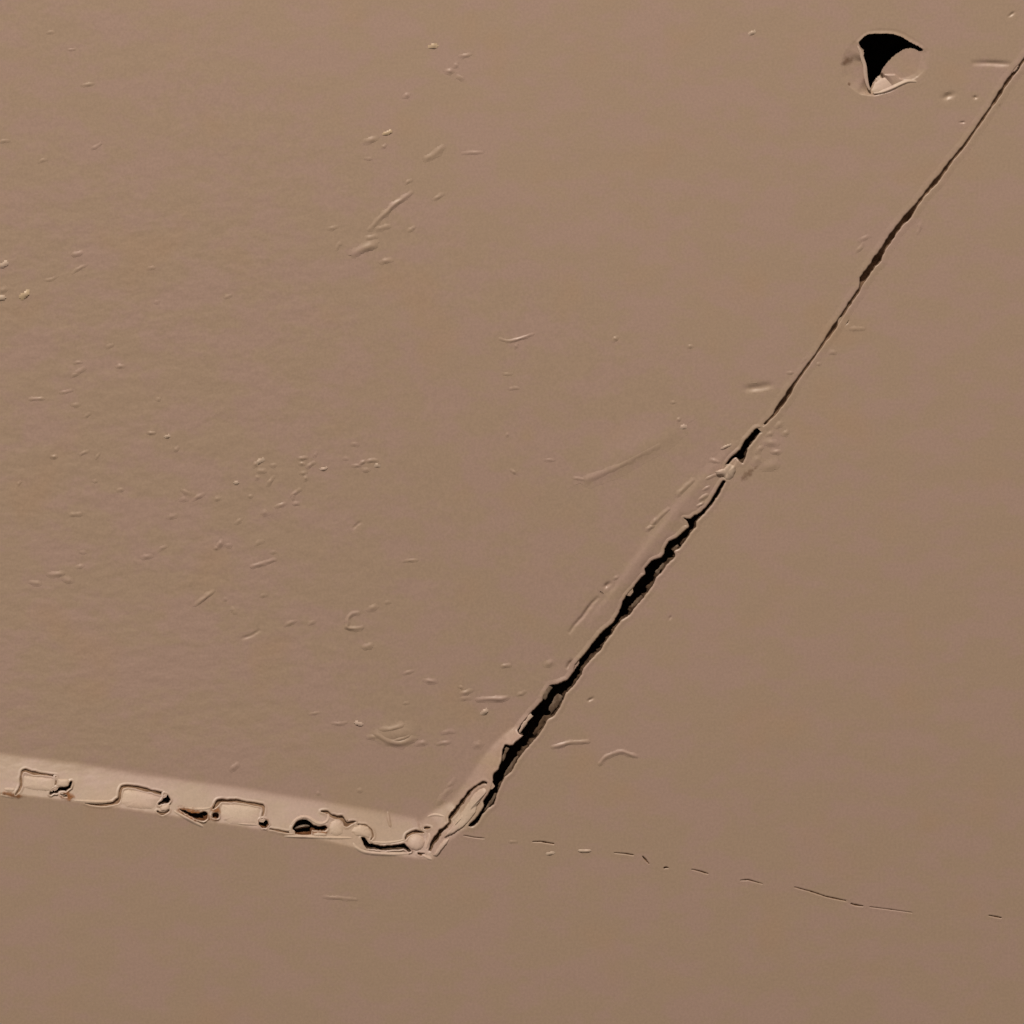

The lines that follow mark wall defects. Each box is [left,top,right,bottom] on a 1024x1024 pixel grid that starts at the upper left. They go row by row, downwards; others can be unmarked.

spalling [836,24,933,100]
crack [425,47,1024,855]
crack [610,849,712,878]
crack [737,876,916,916]